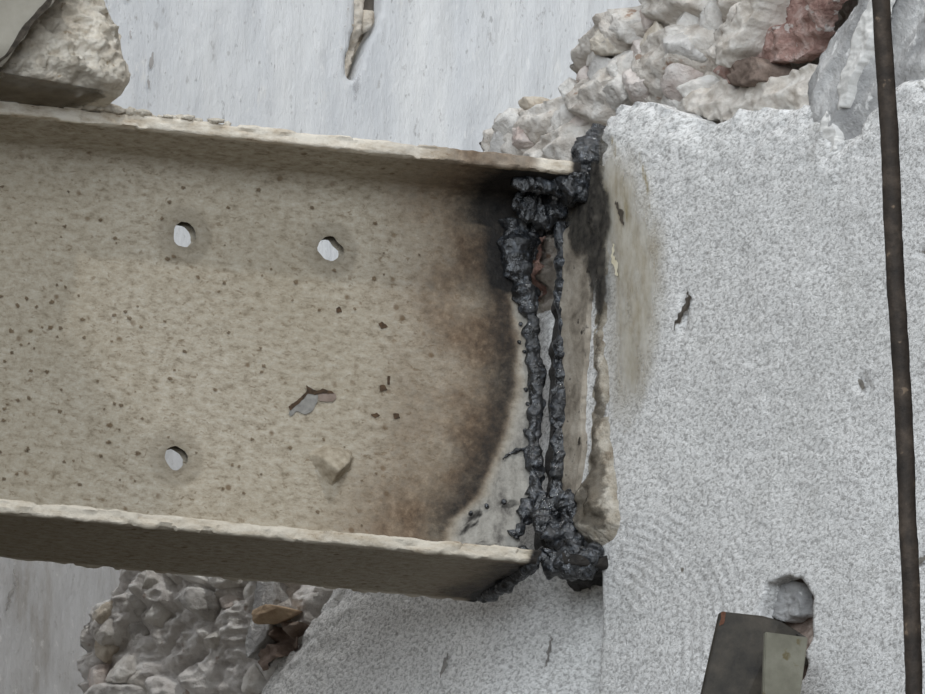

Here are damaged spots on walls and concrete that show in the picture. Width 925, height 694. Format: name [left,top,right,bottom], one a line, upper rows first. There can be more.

flaking render [479,0,878,161]
peeling [890,0,925,89]
flaking render [531,236,557,314]
peeling [289,385,336,416]
flaking render [77,569,333,694]